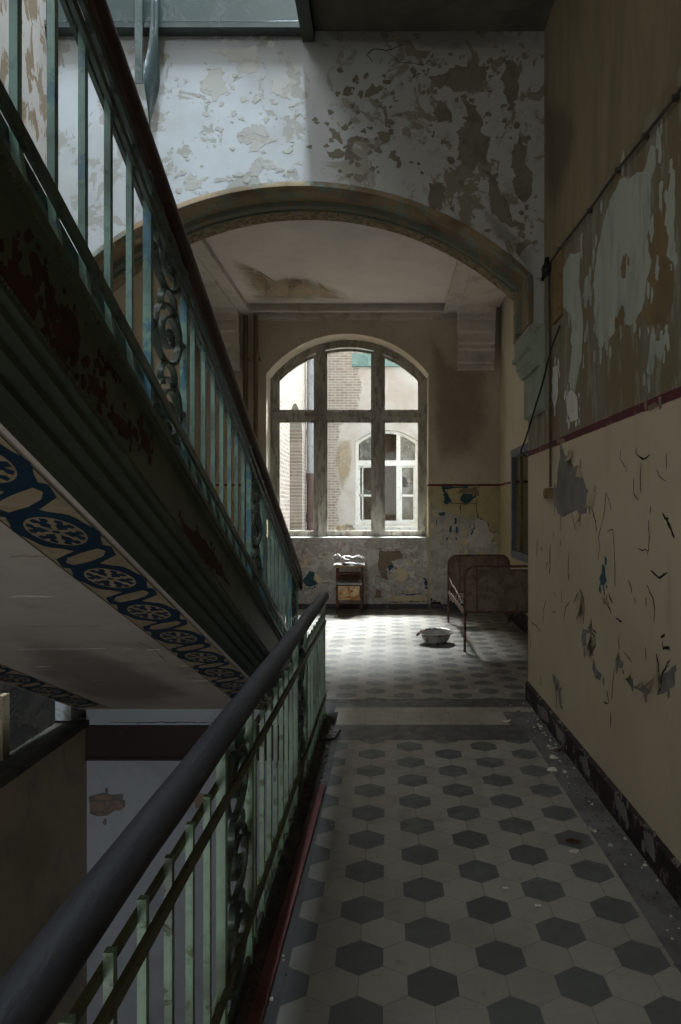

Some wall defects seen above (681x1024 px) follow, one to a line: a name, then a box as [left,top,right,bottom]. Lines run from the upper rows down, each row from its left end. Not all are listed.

peeling [165,31,538,246]
peeling [552,119,678,428]
peeling [554,444,587,523]
peeling [300,555,323,589]
peeling [373,484,499,604]
peeling [599,557,607,593]
peeling [615,650,676,703]
flaking render [89,787,125,825]